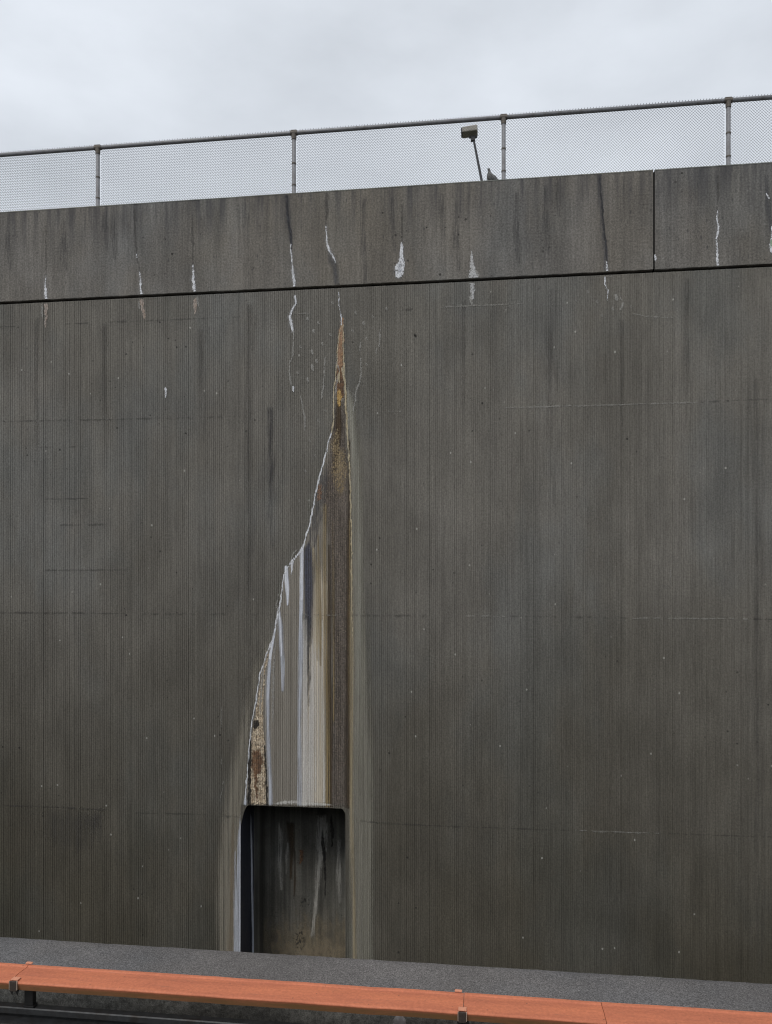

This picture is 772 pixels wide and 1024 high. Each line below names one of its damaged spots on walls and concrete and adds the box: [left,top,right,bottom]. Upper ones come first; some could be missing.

corrosion [335,318,344,406]
water stain [229,313,374,960]
spalling [247,651,269,805]